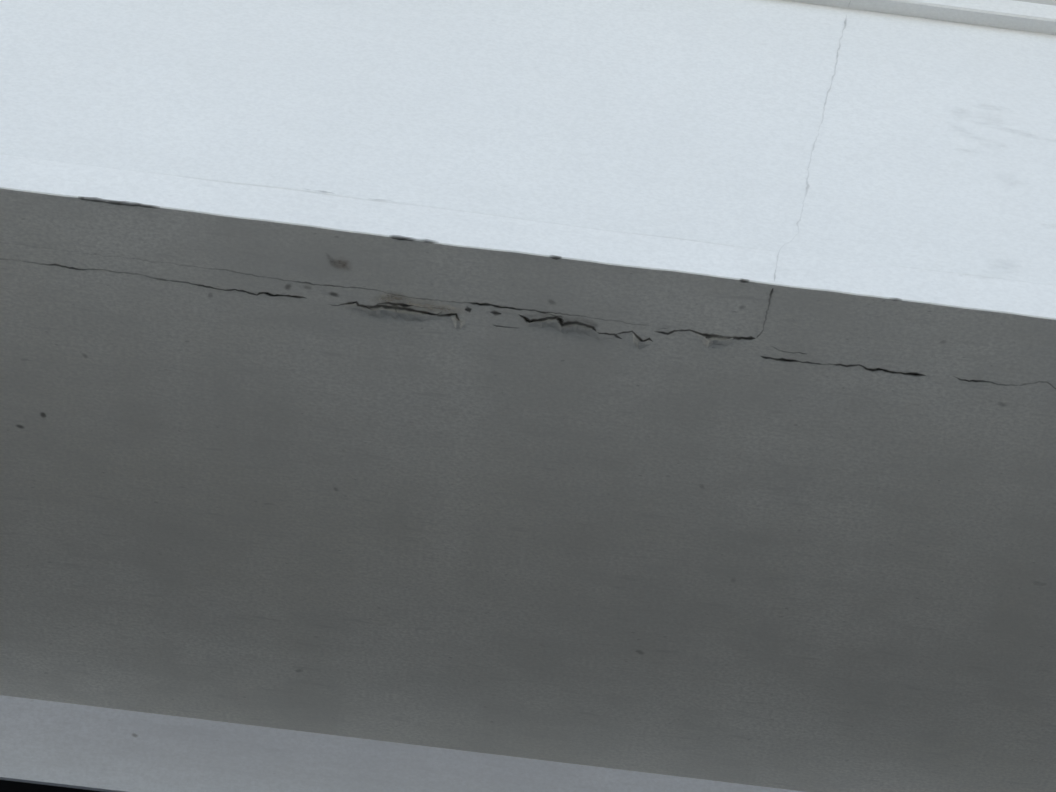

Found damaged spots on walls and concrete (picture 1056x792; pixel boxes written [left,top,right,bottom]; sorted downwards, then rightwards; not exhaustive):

crack [186,282,332,298]
crack [471,303,550,313]
crack [658,330,926,376]